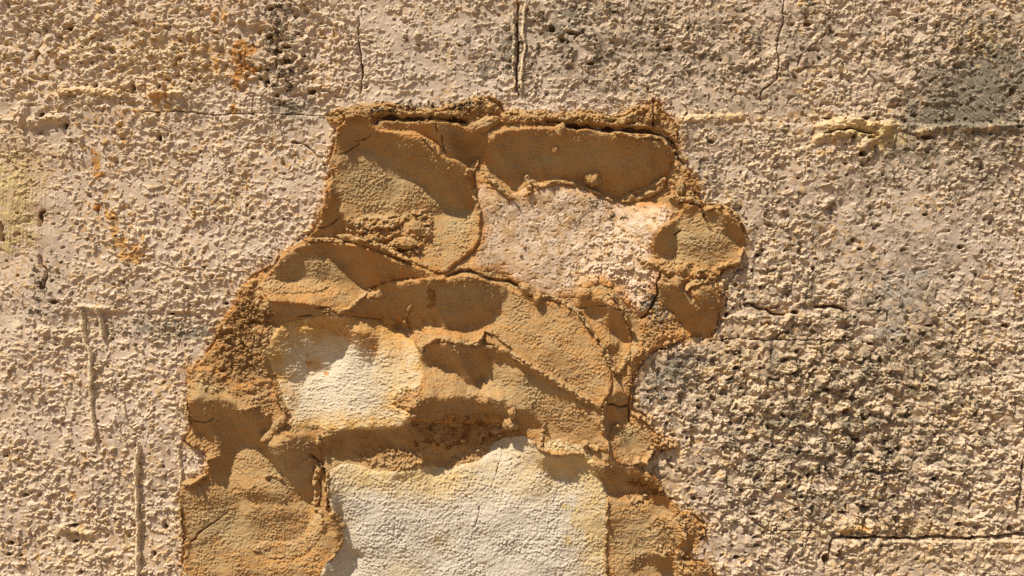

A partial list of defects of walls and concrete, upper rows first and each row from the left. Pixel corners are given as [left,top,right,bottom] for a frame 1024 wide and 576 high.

crack [513,3,521,91]
crack [759,0,826,102]
flaking render [468,182,674,317]
crack [767,463,1024,564]